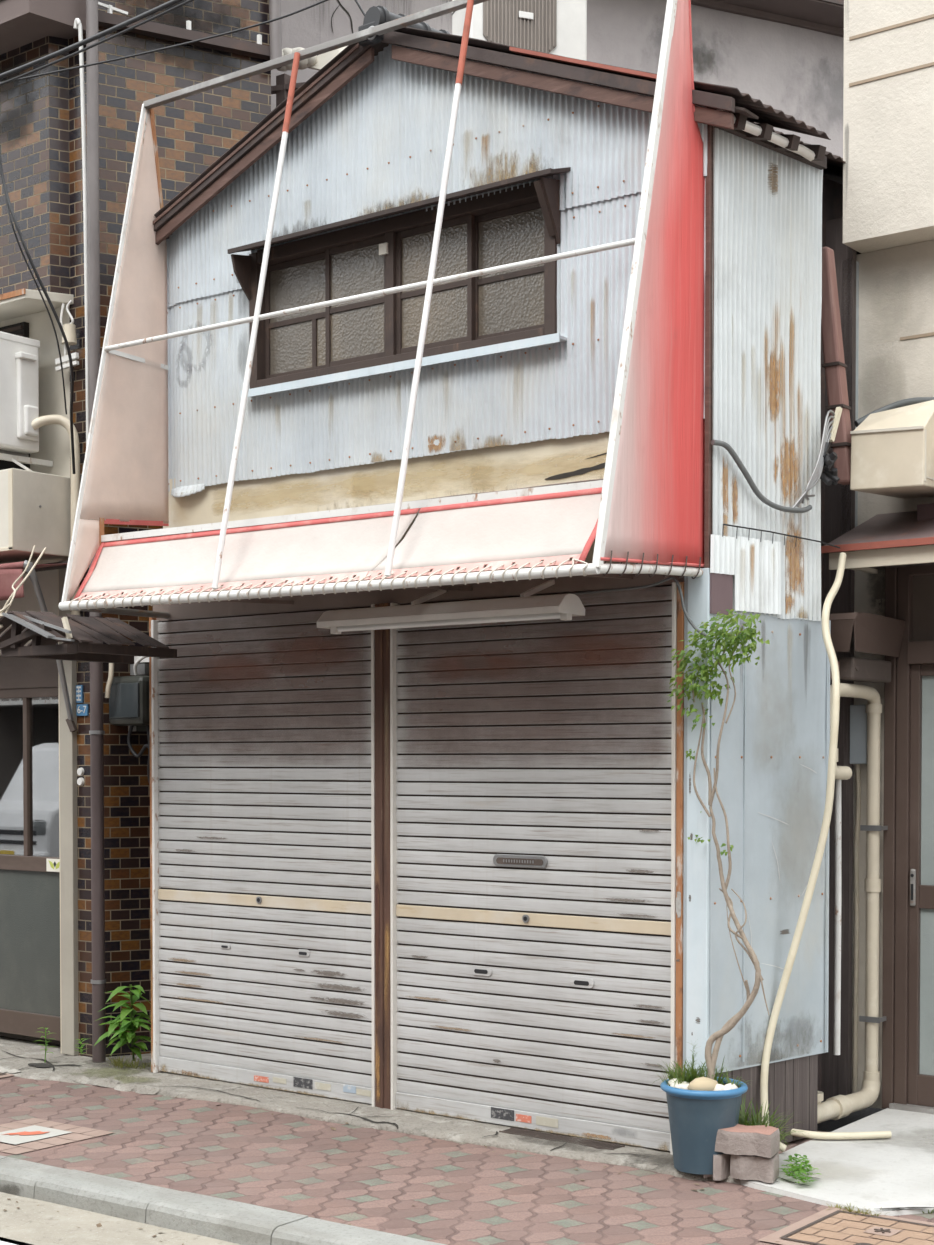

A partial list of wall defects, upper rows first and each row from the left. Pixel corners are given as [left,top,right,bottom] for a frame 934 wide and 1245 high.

rust [765,319,799,428]
rust [775,440,798,499]
rust [785,523,806,618]